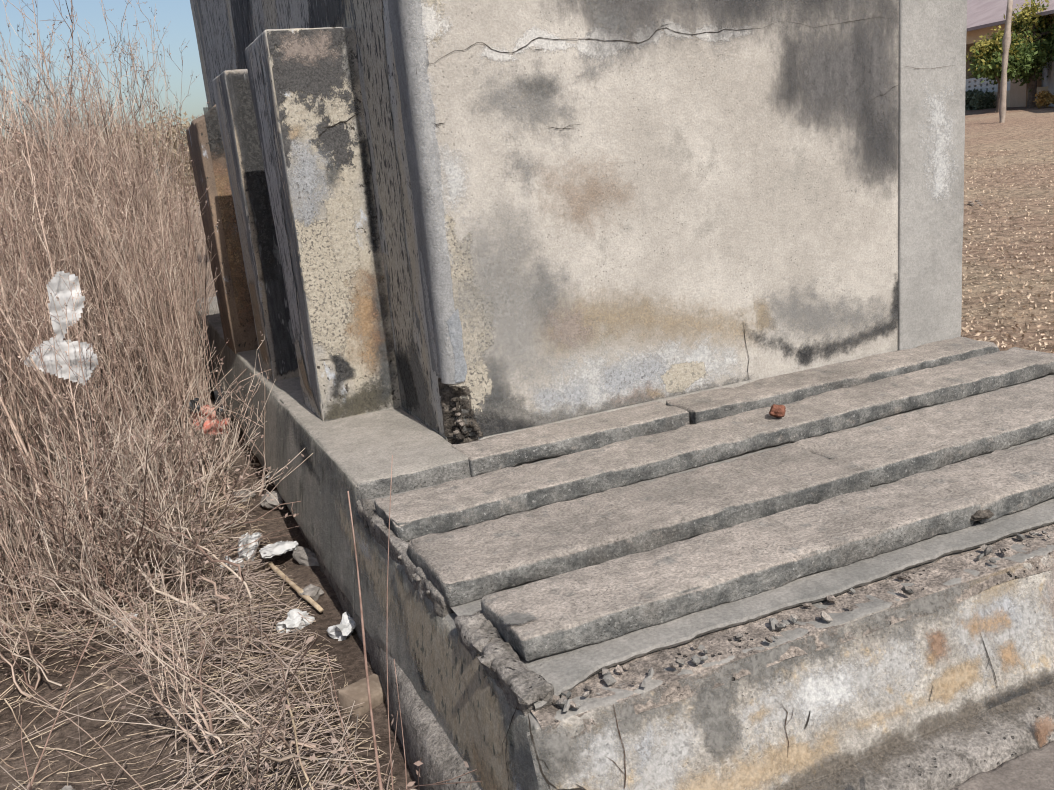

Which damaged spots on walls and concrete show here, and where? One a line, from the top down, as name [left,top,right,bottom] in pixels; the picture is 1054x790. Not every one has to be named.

crack [427,17,895,65]
leakage [267,0,378,252]
leakage [571,0,899,178]
peeling [438,150,496,440]
leakage [755,281,898,365]
crack [502,707,586,790]
crack [605,704,626,790]